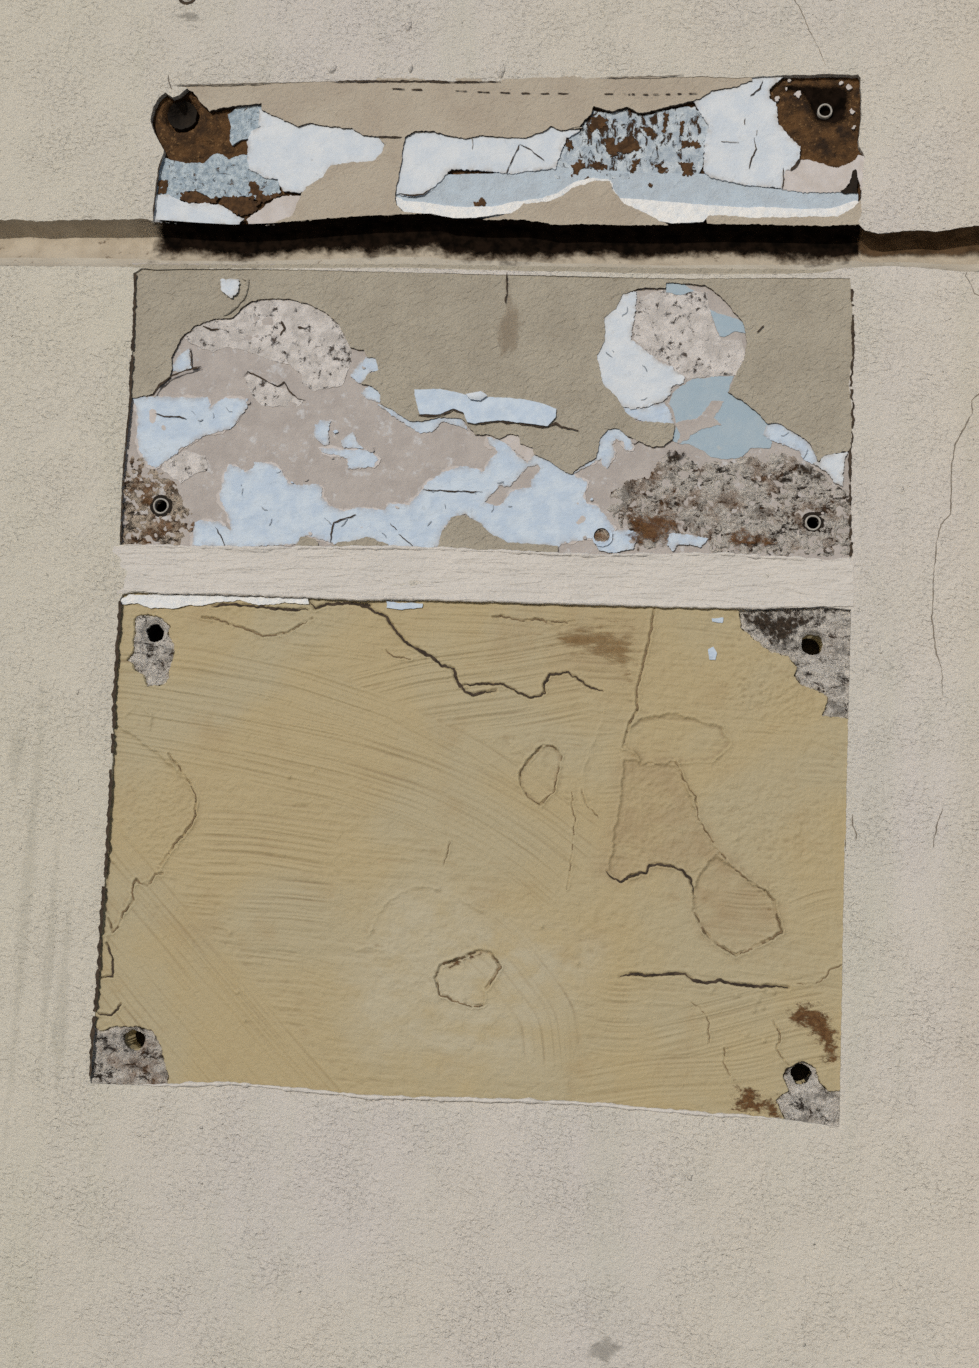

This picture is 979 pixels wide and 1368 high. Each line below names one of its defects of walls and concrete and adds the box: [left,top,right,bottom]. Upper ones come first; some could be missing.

peeling [152,76,864,227]
peeling [120,263,855,560]
crack [931,394,979,694]
crack [202,601,603,698]
crack [622,615,654,745]
crack [98,754,196,1016]
crack [435,951,501,1007]
peeling [89,592,851,1127]
crack [520,745,598,890]
crack [606,764,840,1075]
rust [731,1087,779,1118]
rust [790,1003,838,1062]